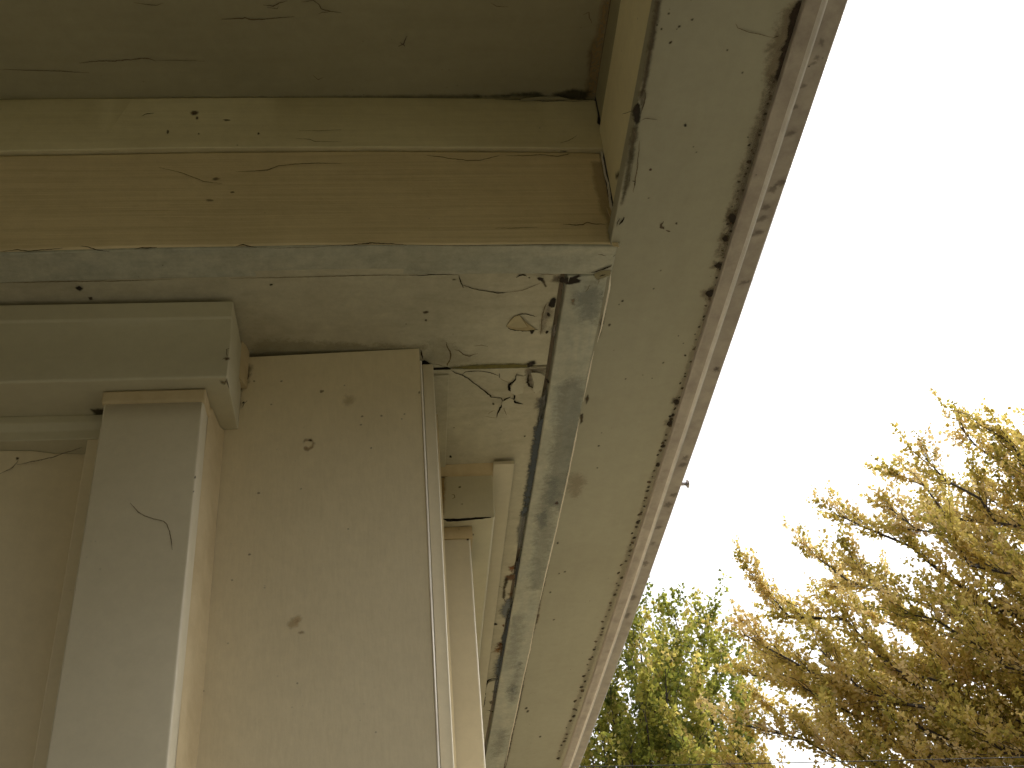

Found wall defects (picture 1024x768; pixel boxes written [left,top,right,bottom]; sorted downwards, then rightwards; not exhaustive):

crack [232,0,341,20]
water stain [642,0,661,92]
water stain [738,0,801,191]
crack [317,274,553,317]
crack [436,343,524,418]
crack [444,515,491,523]
water stain [494,395,547,705]